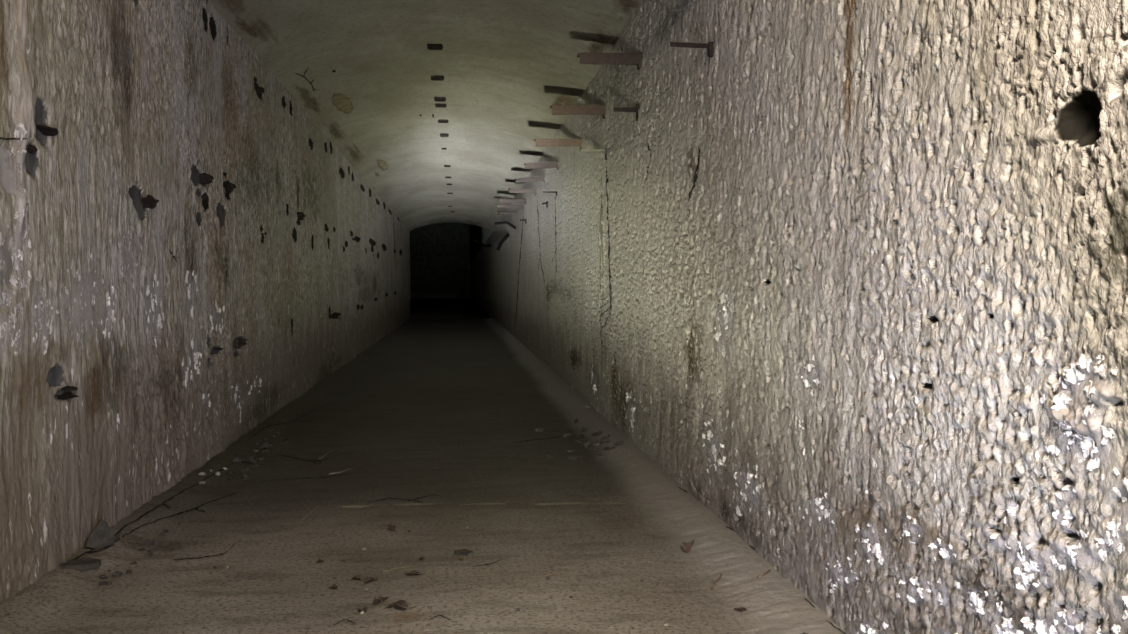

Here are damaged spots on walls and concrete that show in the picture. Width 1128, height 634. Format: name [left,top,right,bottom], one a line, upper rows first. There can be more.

rust [842,0,856,137]
spalling [0,99,59,194]
spalling [1055,90,1102,147]
spalling [128,185,160,221]
spalling [190,164,236,228]
flaking render [0,237,26,306]
water stain [0,186,164,408]
spalling [46,365,79,400]
water stain [989,353,1128,590]
water stain [896,576,1128,634]